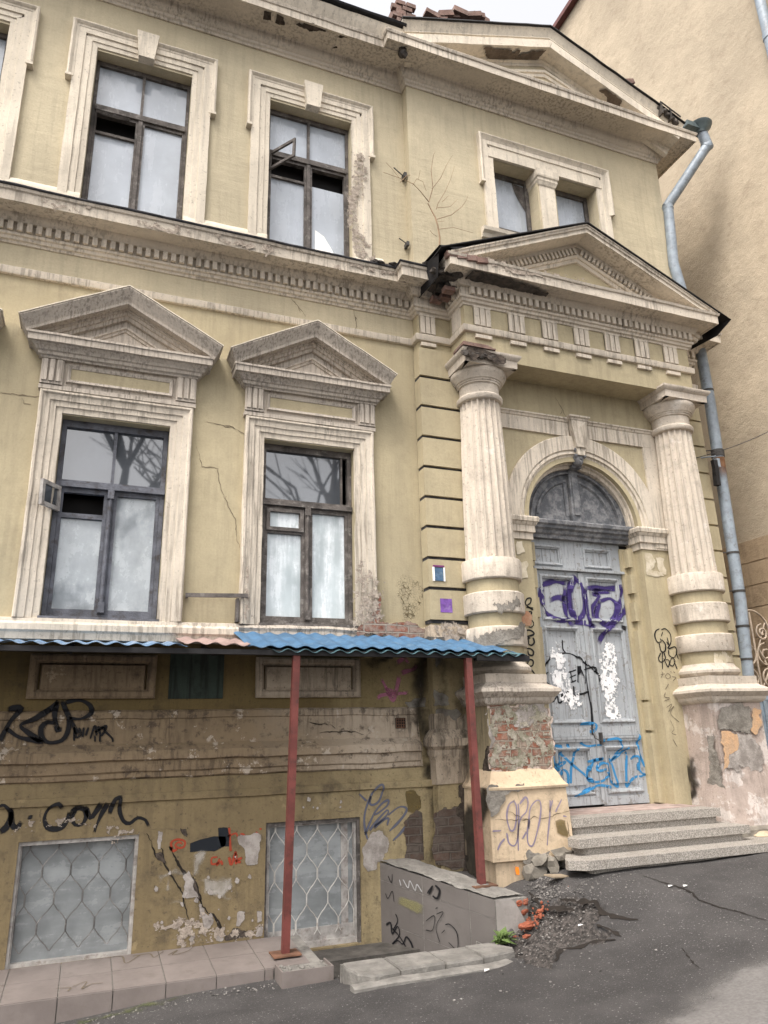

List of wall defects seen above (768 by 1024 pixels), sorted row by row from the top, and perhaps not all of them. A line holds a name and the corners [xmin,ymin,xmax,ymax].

flaking render [484,47,546,60]
flaking render [599,89,622,106]
spalling [467,346,506,364]
crack [197,450,240,547]
flaking render [349,561,532,646]
flaking render [482,704,556,772]
flaking render [718,703,764,772]
flaking render [12,817,139,844]
flaking render [403,784,468,872]
crack [146,825,225,935]
flaking render [153,831,264,948]
crack [645,876,766,920]